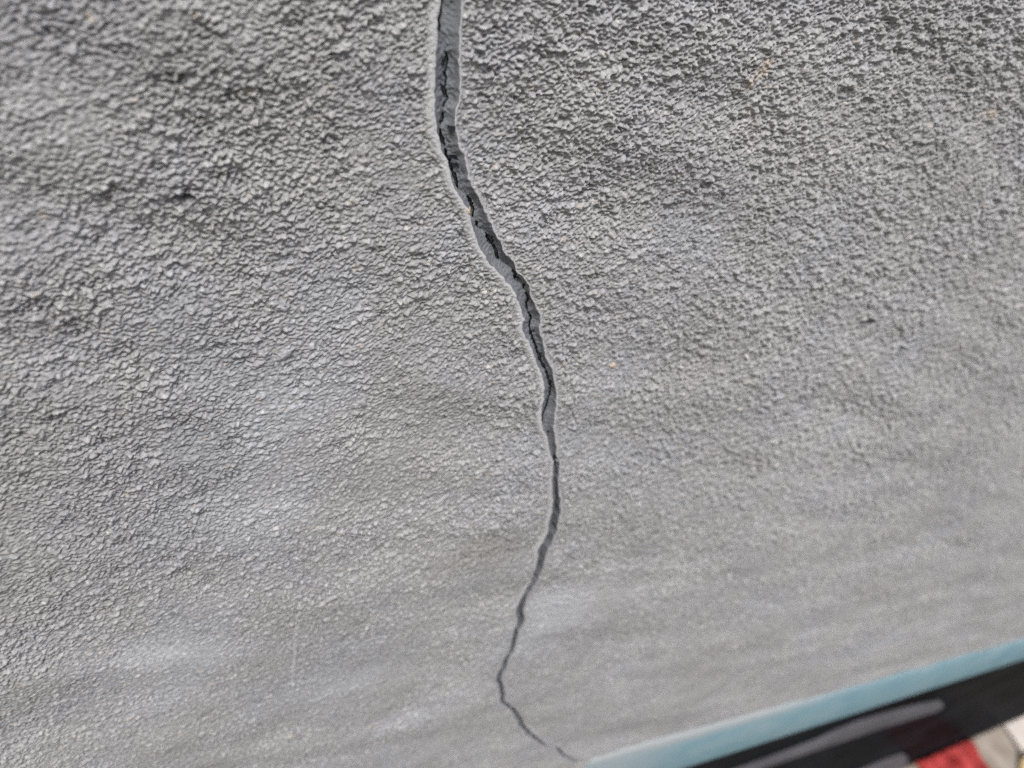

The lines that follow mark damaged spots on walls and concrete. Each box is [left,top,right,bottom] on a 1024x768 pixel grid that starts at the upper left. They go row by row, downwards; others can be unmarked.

crack [421,0,581,764]